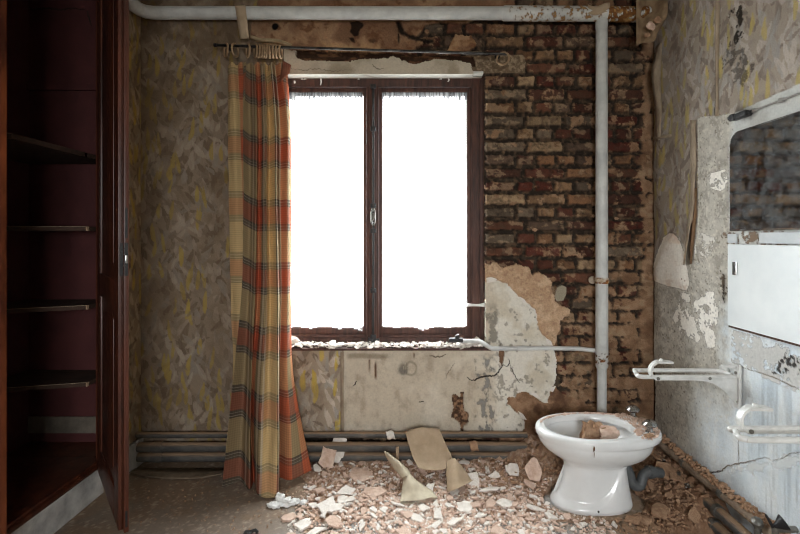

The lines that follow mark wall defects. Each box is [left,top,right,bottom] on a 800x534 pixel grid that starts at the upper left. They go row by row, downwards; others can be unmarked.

rust [512,5,650,23]
peeling [708,169,728,191]
spalling [251,20,597,442]
spalling [607,22,655,420]
peeling [672,270,728,348]
crack [430,354,520,383]
peeling [731,330,800,392]
crack [705,440,799,474]